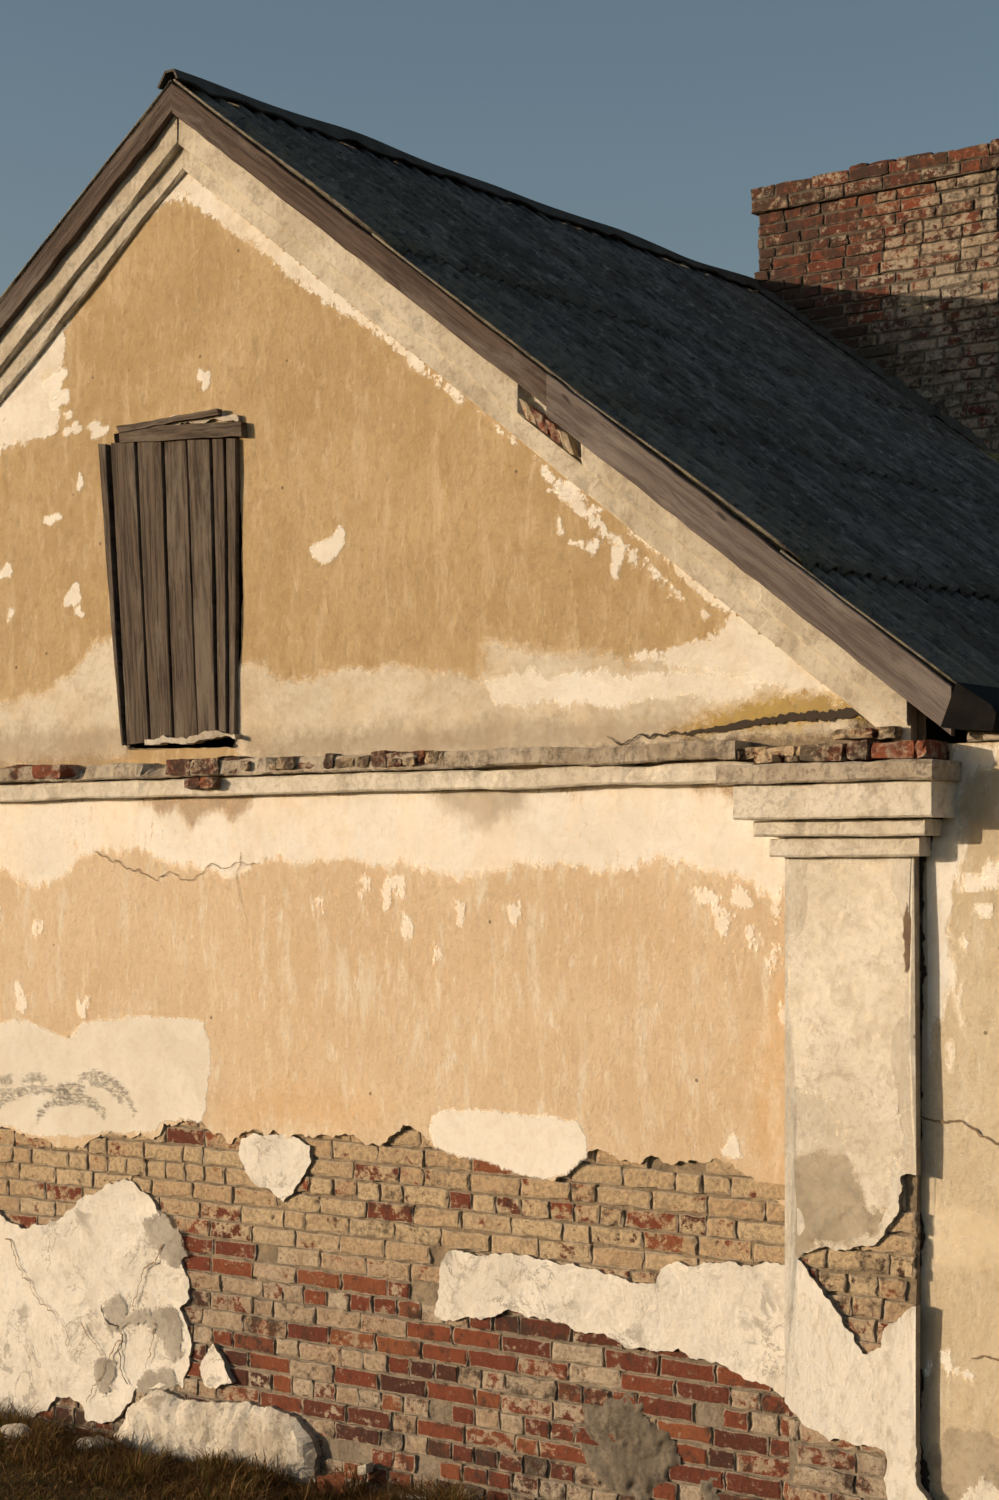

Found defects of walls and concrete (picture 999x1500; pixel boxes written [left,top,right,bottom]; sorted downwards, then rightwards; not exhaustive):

peeling [146,174,519,445]
peeling [0,313,109,456]
water stain [0,726,123,766]
water stain [245,716,680,758]
crack [95,851,256,924]
spalling [0,455,999,1500]
crack [920,818,943,1037]
crack [921,1086,999,1145]
crack [918,1212,926,1268]
crack [920,1368,930,1493]